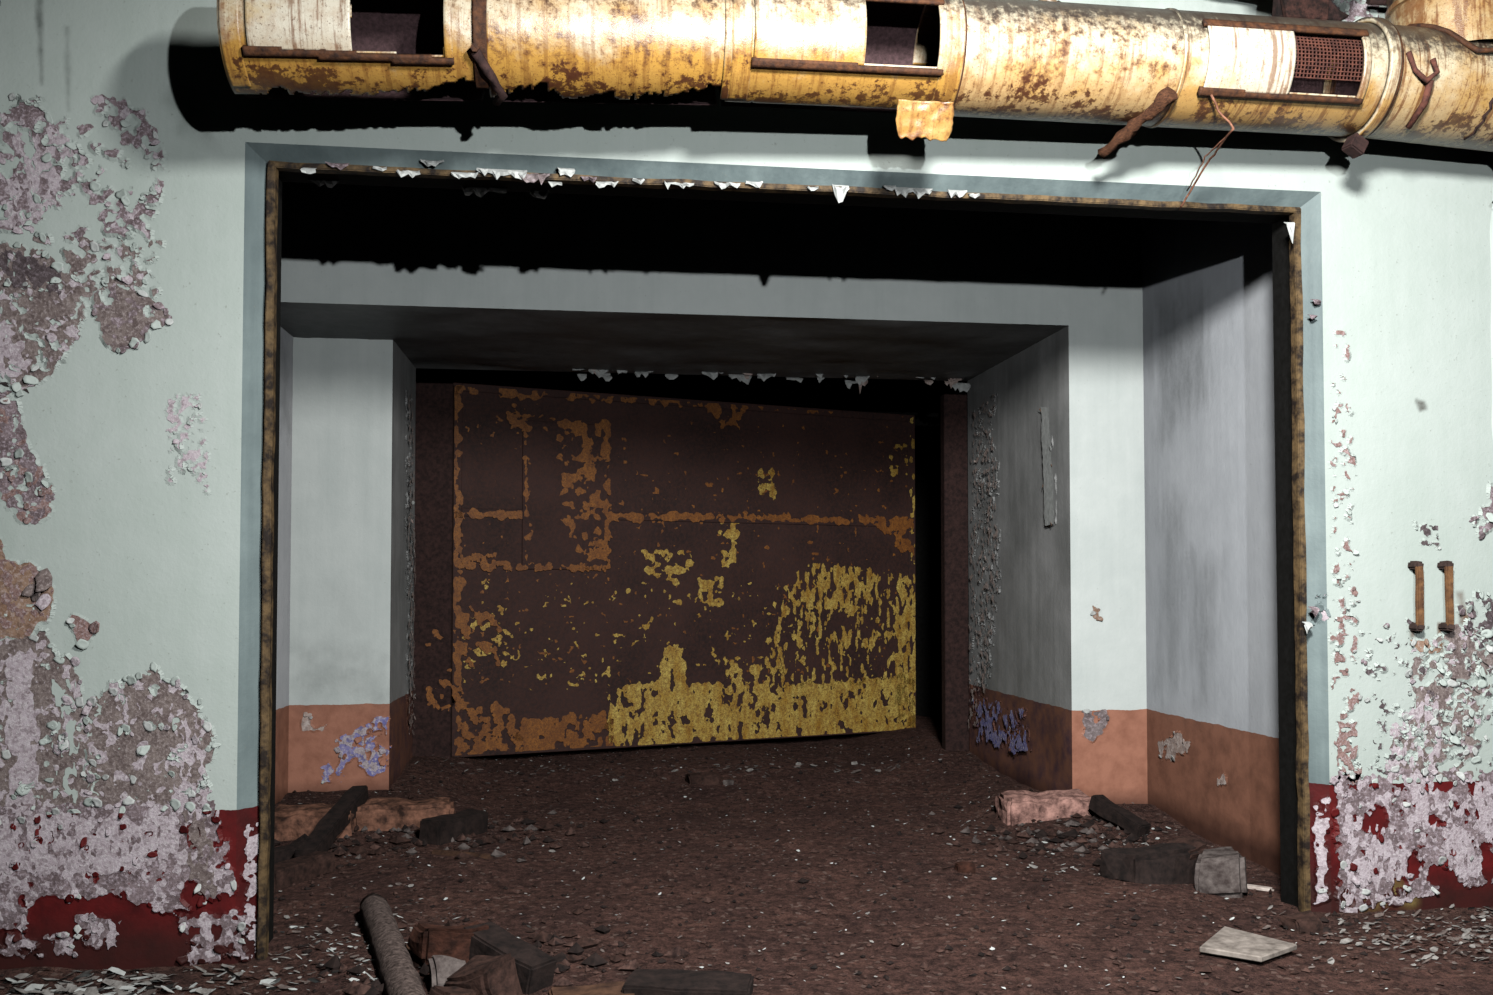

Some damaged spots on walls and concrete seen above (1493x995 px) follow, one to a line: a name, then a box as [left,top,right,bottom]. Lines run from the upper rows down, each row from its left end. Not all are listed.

peeling [300,162,350,188]
peeling [373,159,645,199]
peeling [664,181,694,189]
peeling [714,181,763,189]
peeling [807,184,849,203]
peeling [883,185,980,199]
peeling [1284,222,1295,244]
peeling [0,92,174,526]
peeling [572,369,678,381]
peeling [702,372,825,385]
peeling [1297,328,1493,972]
peeling [0,534,379,995]